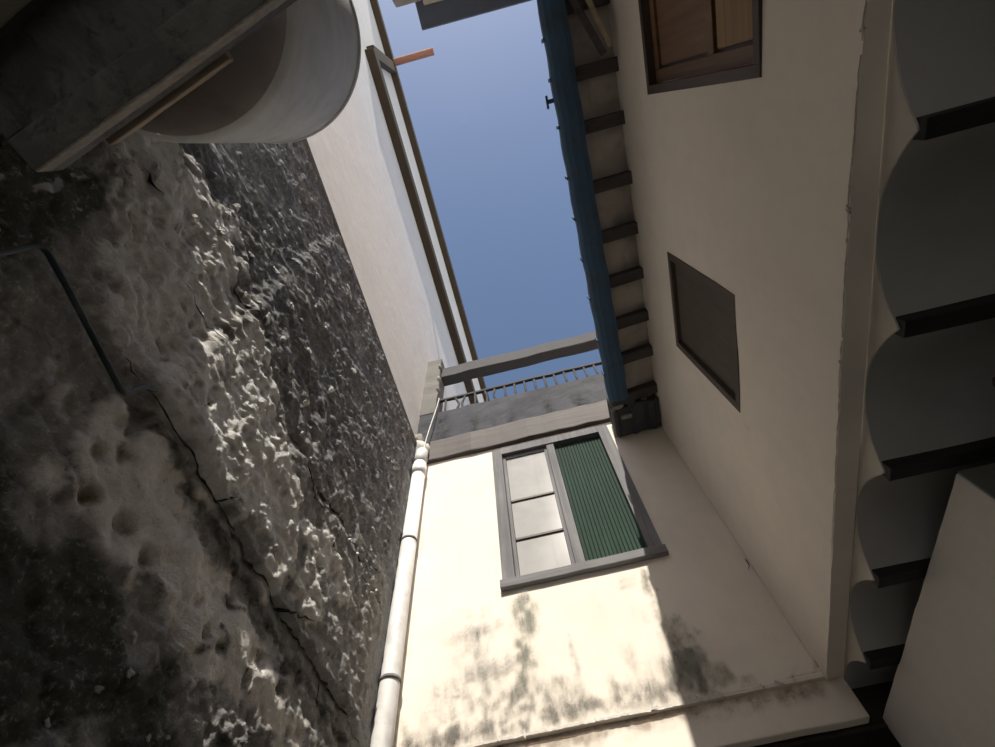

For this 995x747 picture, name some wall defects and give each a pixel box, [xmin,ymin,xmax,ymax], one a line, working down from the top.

damp [170,440,281,645]
crack [123,355,360,746]
crack [290,431,382,610]
damp [514,593,533,631]
damp [515,640,529,696]
damp [638,634,708,698]
damp [432,725,468,747]
damp [480,719,506,734]
damp [542,698,602,723]